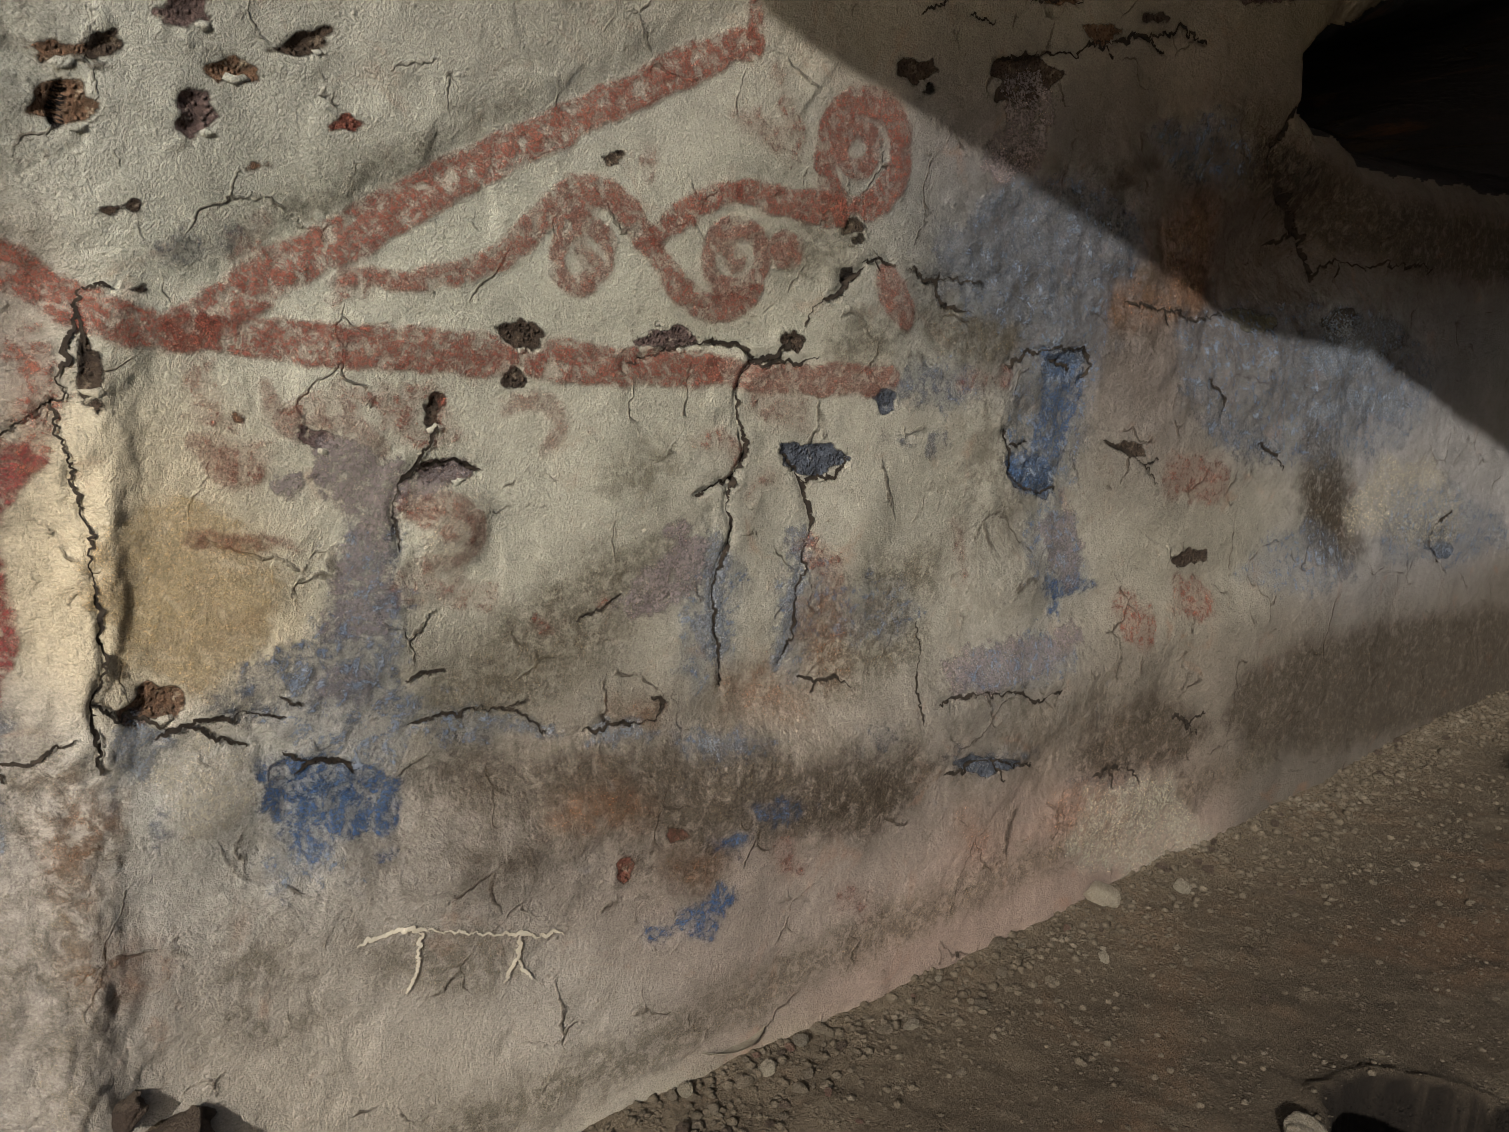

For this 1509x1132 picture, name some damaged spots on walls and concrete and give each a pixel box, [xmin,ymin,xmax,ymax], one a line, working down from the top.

spalling [24,27,124,132]
spalling [151,0,212,32]
spalling [174,55,260,139]
spalling [266,24,334,57]
crack [626,256,984,693]
spalling [780,442,851,482]
crack [0,281,354,785]
damp [769,526,926,700]
spalling [115,680,185,730]
crack [406,695,665,735]
crack [915,623,1062,726]
crack [357,925,564,995]